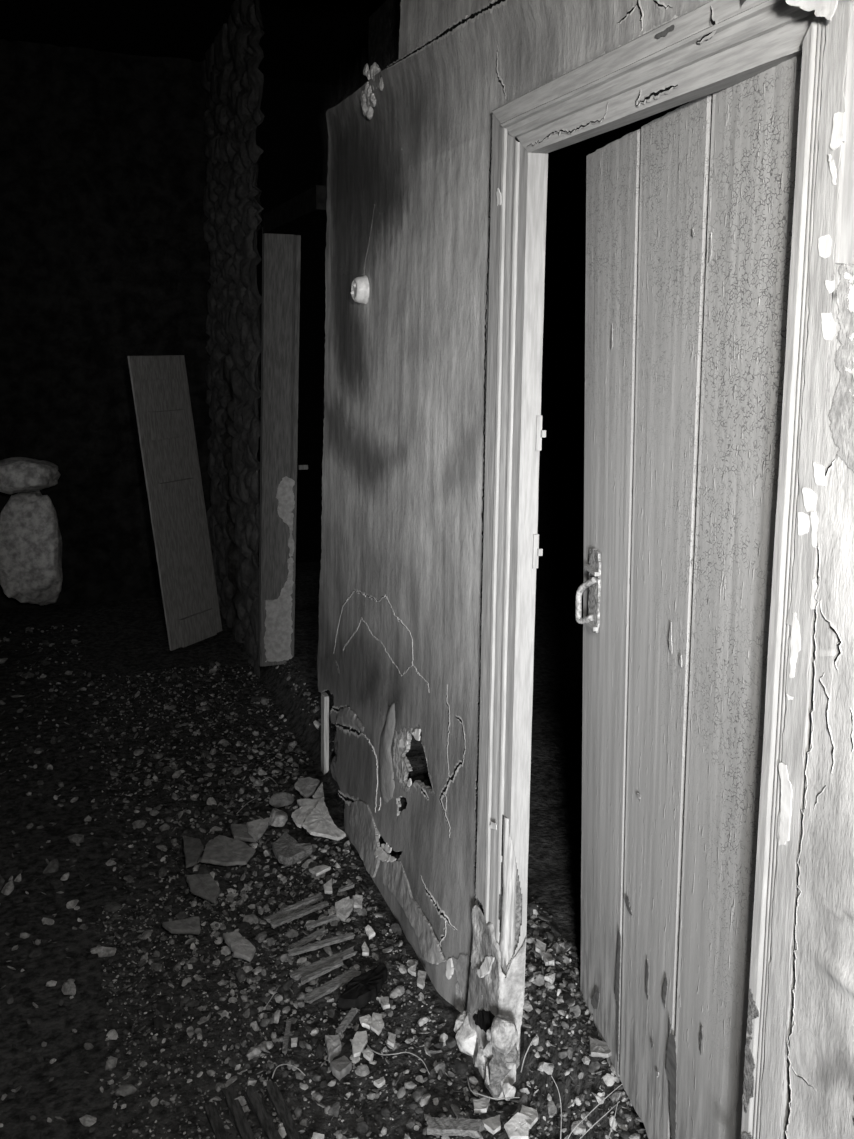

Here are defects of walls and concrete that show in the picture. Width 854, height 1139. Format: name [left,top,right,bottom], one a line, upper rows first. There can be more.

crack [387,0,508,69]
crack [495,0,718,99]
peeling [785,0,839,21]
crack [527,84,678,147]
peeling [818,235,854,471]
peeling [263,476,295,662]
crack [421,138,492,906]
peeling [798,462,826,548]
flaking render [393,725,434,817]
crack [785,548,854,1139]
crack [420,875,457,948]
spalling [446,898,526,1101]